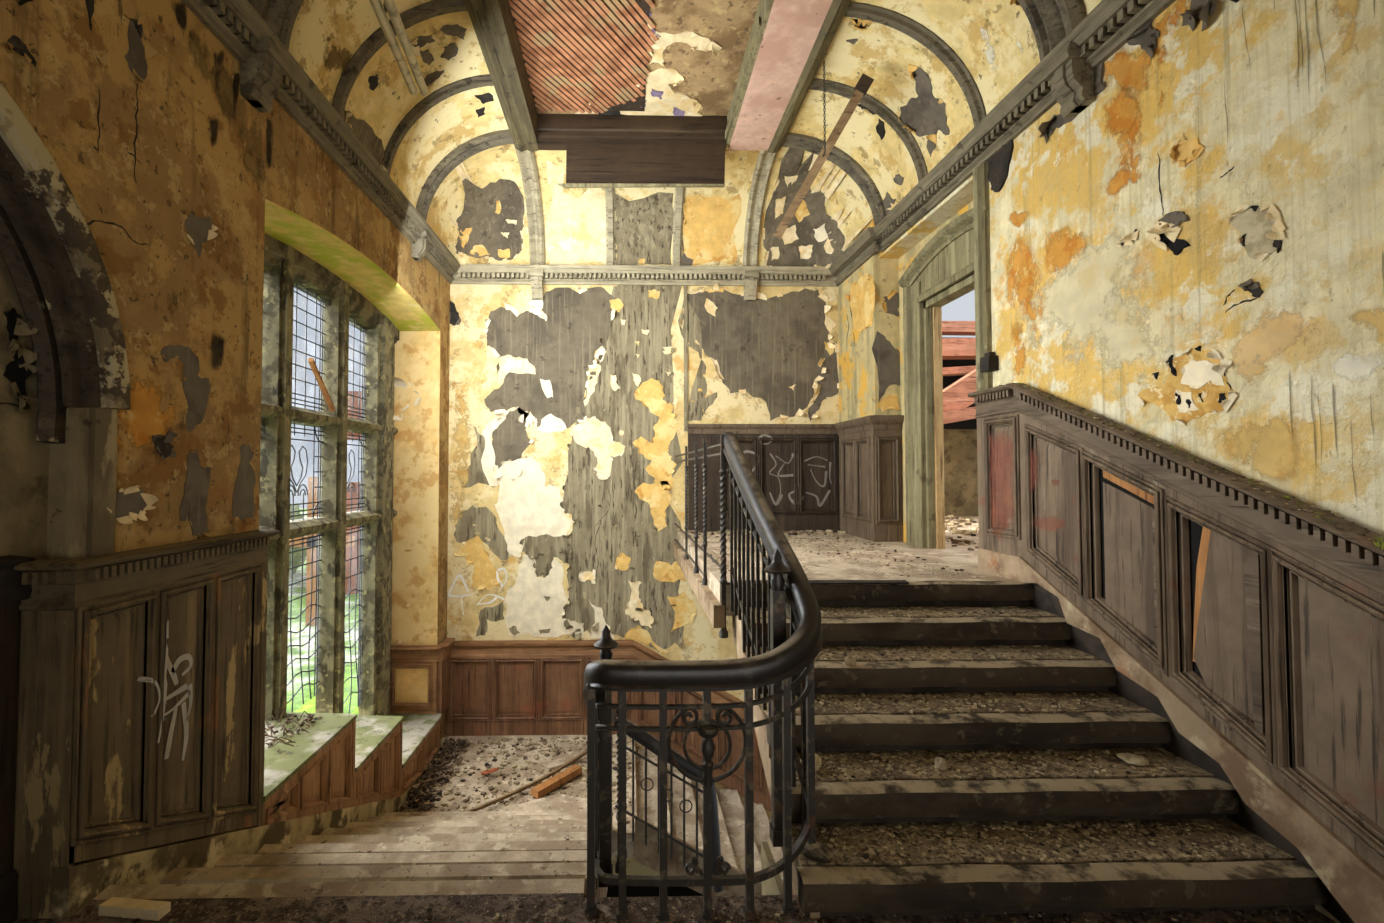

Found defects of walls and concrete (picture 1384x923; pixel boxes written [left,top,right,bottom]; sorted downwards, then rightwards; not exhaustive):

peeling [575,11,722,116]
peeling [846,19,873,44]
peeling [857,65,950,157]
damp [1295,0,1375,82]
crack [87,220,149,245]
flaking render [1227,204,1286,262]
flaking render [1027,211,1238,426]
flaking render [1238,278,1263,298]
peeling [152,345,216,537]
flaking render [448,147,904,655]
damp [1224,375,1295,479]
damp [1311,308,1384,492]